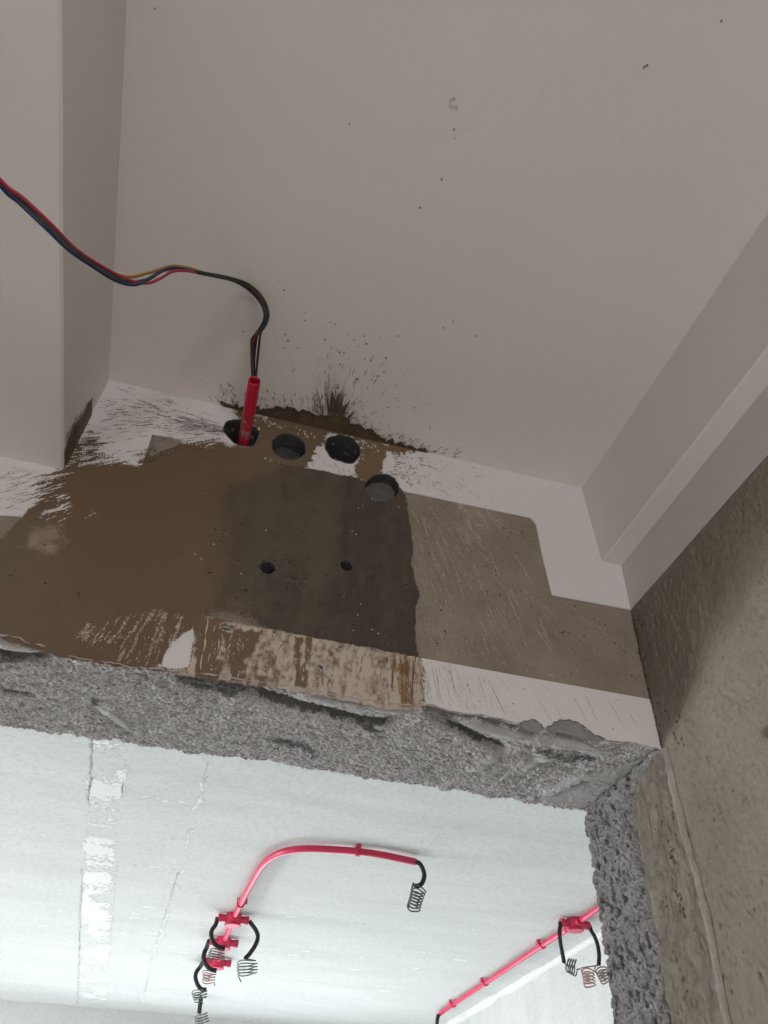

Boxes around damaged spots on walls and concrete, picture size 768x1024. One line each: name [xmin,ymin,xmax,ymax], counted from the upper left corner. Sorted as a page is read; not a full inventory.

spalling [68,655,267,699]
spalling [519,719,625,744]
spalling [260,737,316,760]
spalling [536,749,597,763]